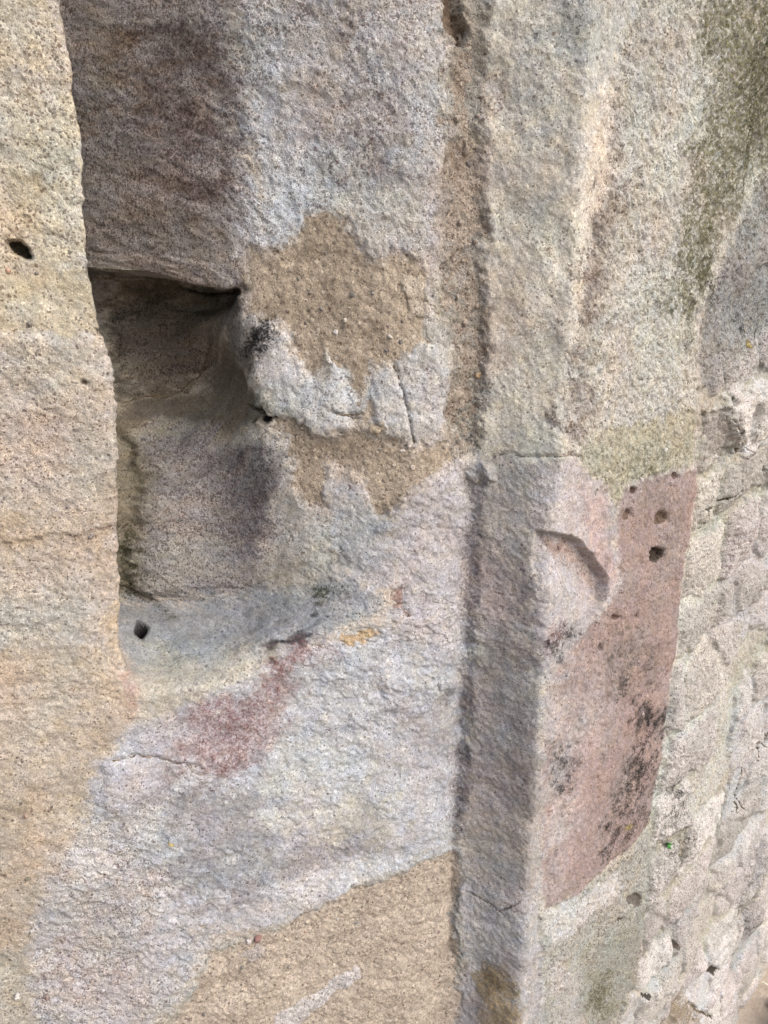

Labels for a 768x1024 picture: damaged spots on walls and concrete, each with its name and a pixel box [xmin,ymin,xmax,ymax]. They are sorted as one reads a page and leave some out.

leakage [741,20,768,164]
flaking render [241,0,491,516]
crack [112,754,209,776]